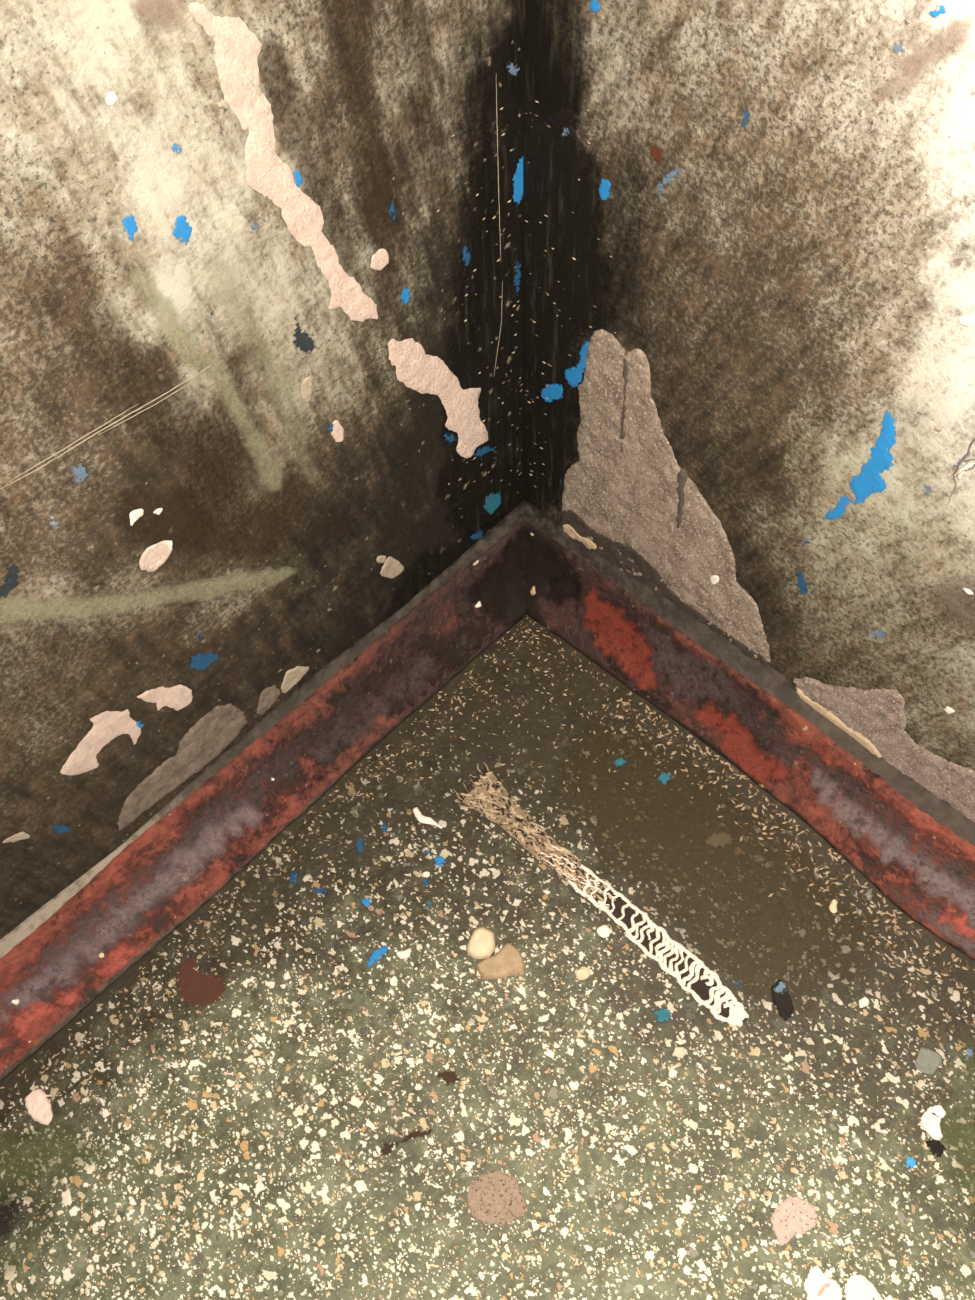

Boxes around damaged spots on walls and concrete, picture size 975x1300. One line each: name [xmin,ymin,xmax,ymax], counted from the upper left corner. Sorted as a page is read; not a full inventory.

flaking render [187,2,378,322]
damp [265,51,353,269]
damp [332,0,392,272]
damp [392,0,628,625]
flaking render [388,338,495,458]
flaking render [561,329,771,663]
crack [947,438,975,505]
crack [956,583,975,596]
peeling [60,685,193,775]
peeling [118,666,309,831]
peeling [793,677,975,823]
rust [176,956,226,1009]